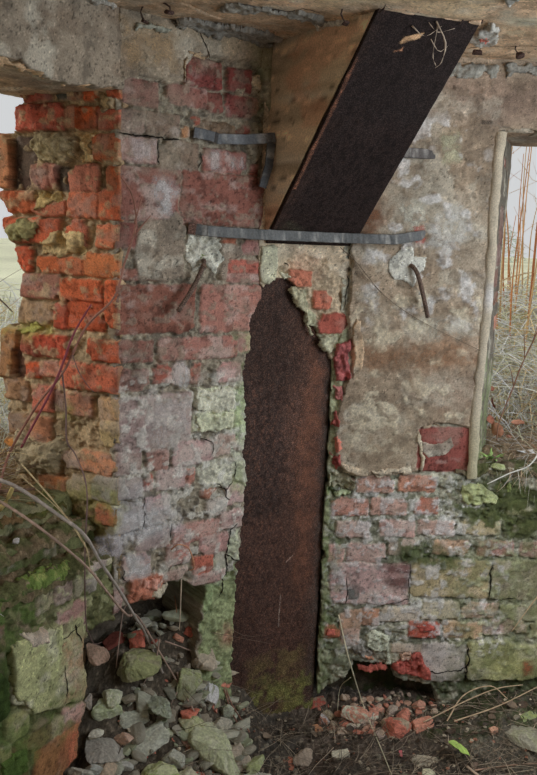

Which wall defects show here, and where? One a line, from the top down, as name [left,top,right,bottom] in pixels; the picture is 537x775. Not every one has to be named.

spalling [134,2,328,96]
spalling [469,23,500,48]
spalling [14,103,65,130]
crack [119,132,179,164]
spalling [259,244,365,401]
spalling [192,385,236,433]
spalling [328,410,469,496]
spalling [357,651,431,680]